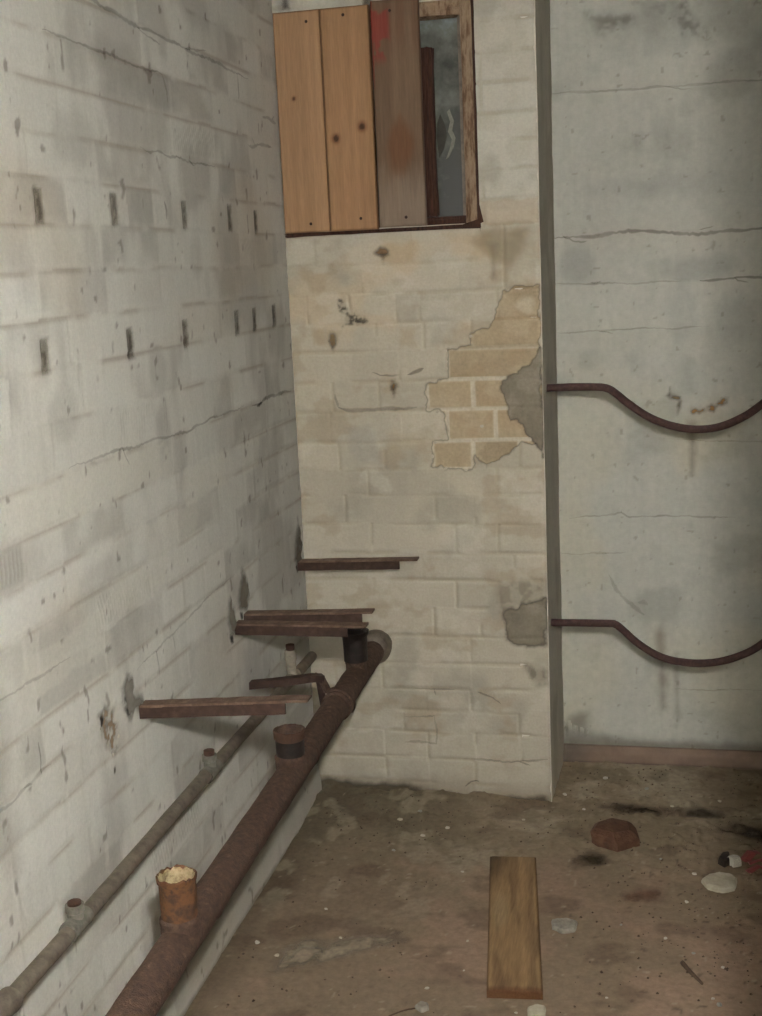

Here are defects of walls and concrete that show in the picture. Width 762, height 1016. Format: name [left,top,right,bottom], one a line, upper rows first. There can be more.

peeling [425,284,541,471]